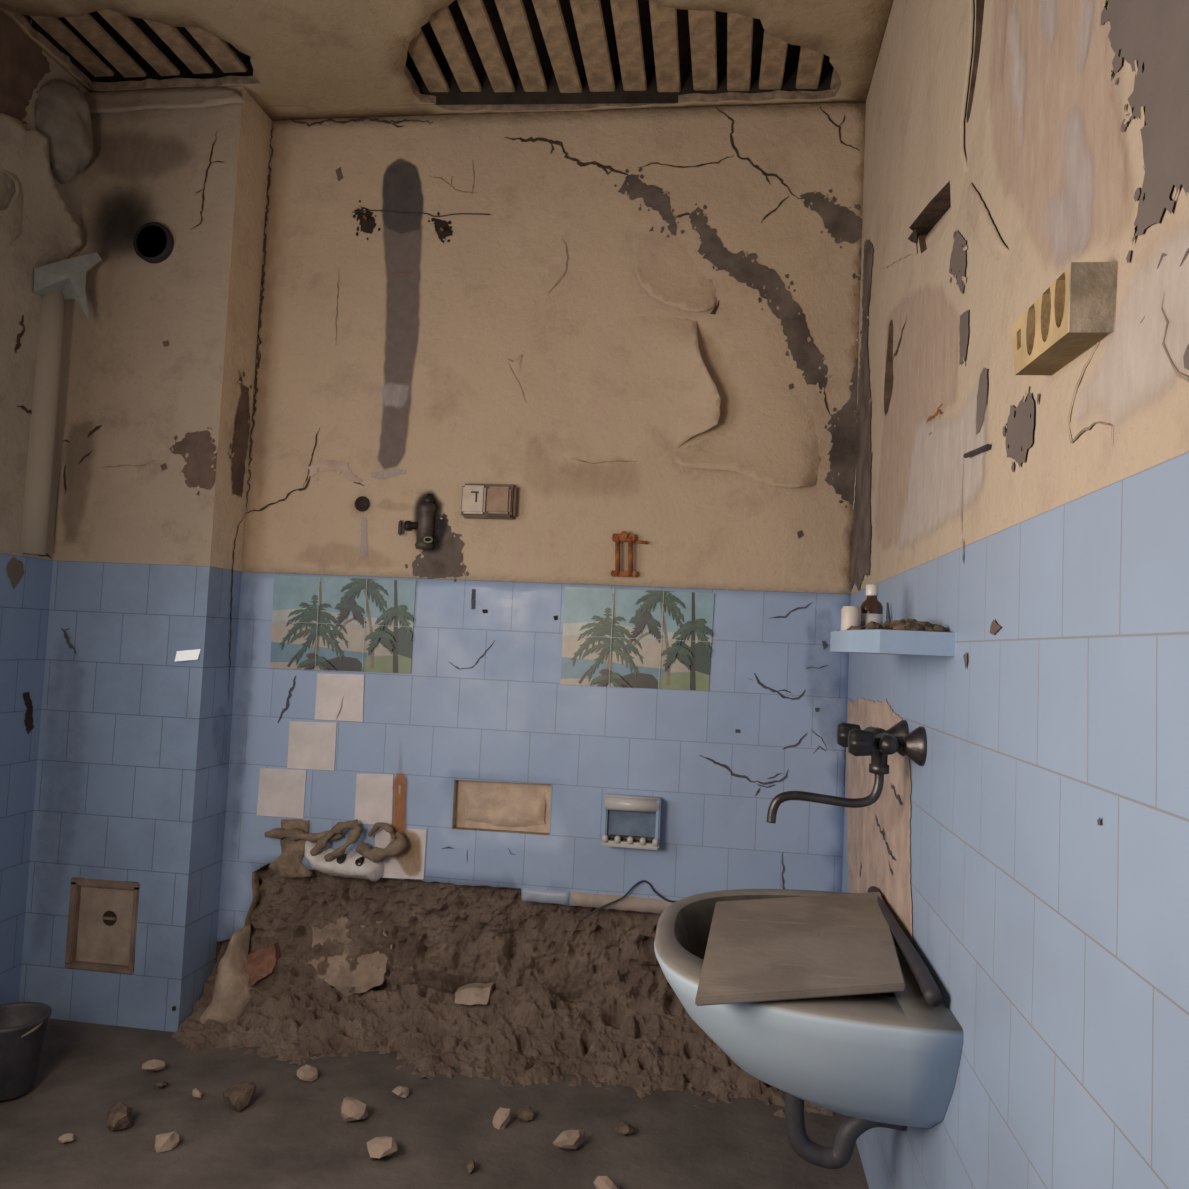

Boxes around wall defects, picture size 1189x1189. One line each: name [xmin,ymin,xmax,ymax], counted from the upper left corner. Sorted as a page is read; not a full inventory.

crack [504,108,802,223]
crack [820,107,860,151]
flaking render [1079,0,1189,263]
flaking render [160,368,252,498]
water stain [372,159,423,479]
crack [548,240,569,293]
peeling [800,189,987,593]
peeling [1077,231,1189,420]
crack [841,747,849,798]
peeling [847,698,902,730]
peeling [846,747,914,946]
spalling [170,863,785,1118]